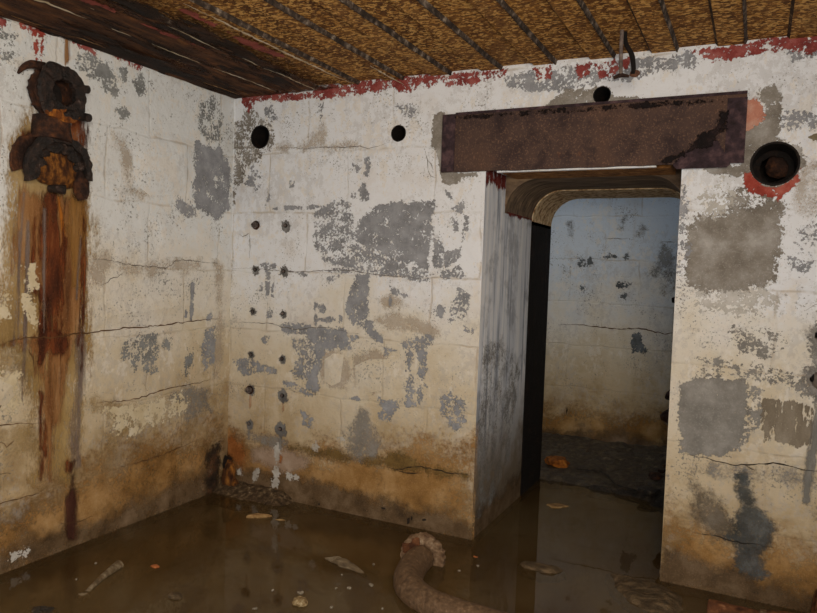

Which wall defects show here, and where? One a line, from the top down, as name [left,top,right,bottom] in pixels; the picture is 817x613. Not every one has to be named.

rust [41,39,69,81]
rust [455,99,729,166]
peeling [0,0,817,458]
rust [0,93,98,540]
crack [2,314,210,371]
damp [0,331,521,574]
crack [685,453,812,471]